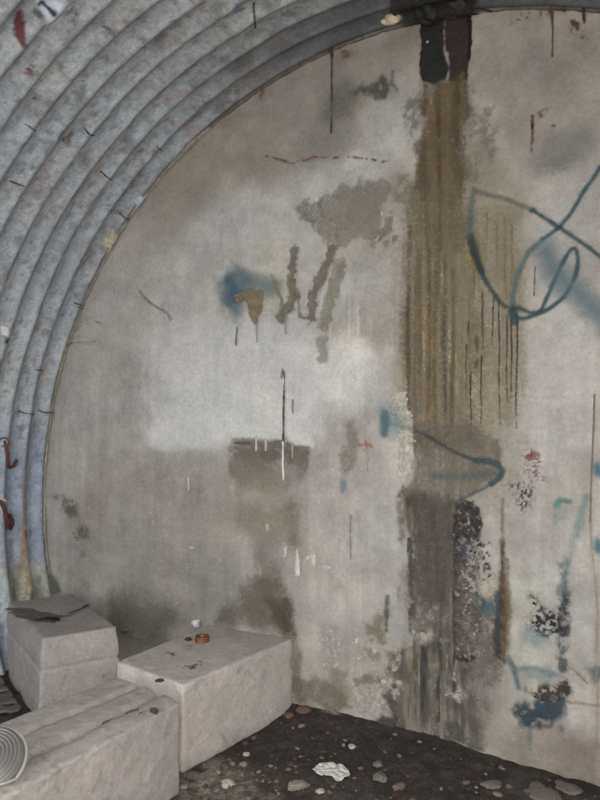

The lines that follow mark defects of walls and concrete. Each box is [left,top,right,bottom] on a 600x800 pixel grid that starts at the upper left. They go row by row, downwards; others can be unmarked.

rust [403,72,484,450]
damp [216,542,350,715]
damp [366,210,521,751]
damp [555,565,571,672]